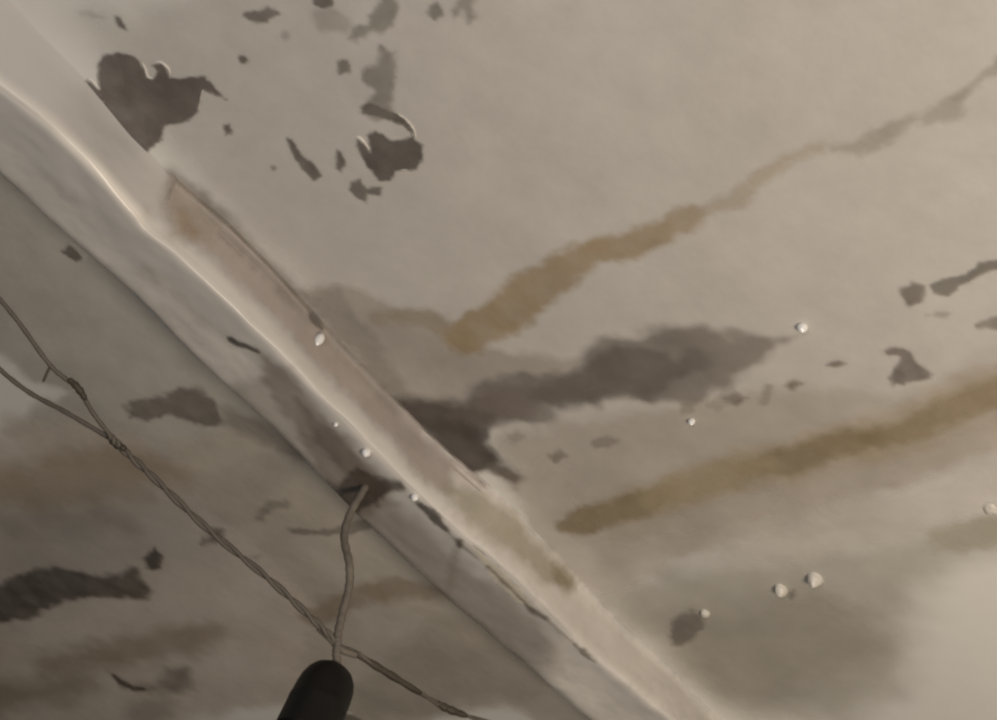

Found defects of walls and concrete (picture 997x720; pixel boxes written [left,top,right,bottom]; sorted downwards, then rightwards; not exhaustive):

damp [137,18,204,79]
peeling [86,53,228,151]
peeling [289,140,320,180]
peeling [350,96,422,200]
damp [209,0,997,292]
damp [758,268,955,383]
peeling [887,349,929,384]
peeling [903,262,997,306]
damp [0,163,595,720]
damp [168,155,856,720]
peeling [0,568,149,622]
damp [617,519,997,715]